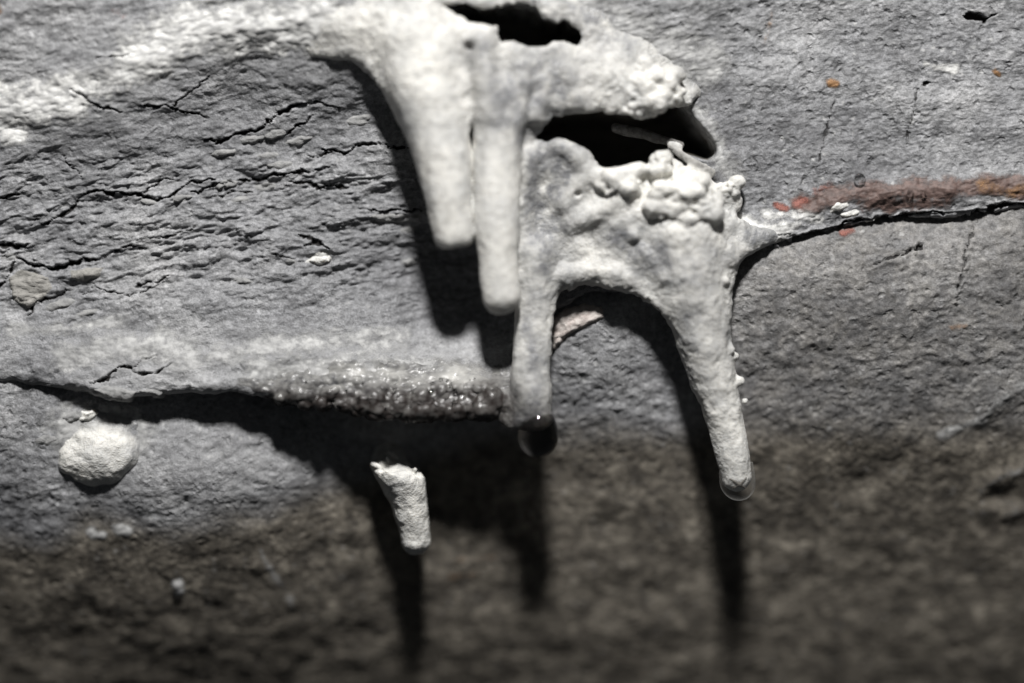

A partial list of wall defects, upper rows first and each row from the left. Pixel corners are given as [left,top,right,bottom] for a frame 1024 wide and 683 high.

crack [84,75,340,145]
leakage [0,0,823,317]
crack [0,142,409,316]
crack [773,211,943,245]
rust [773,172,1024,214]
crack [971,202,1024,213]
leakage [48,400,152,453]